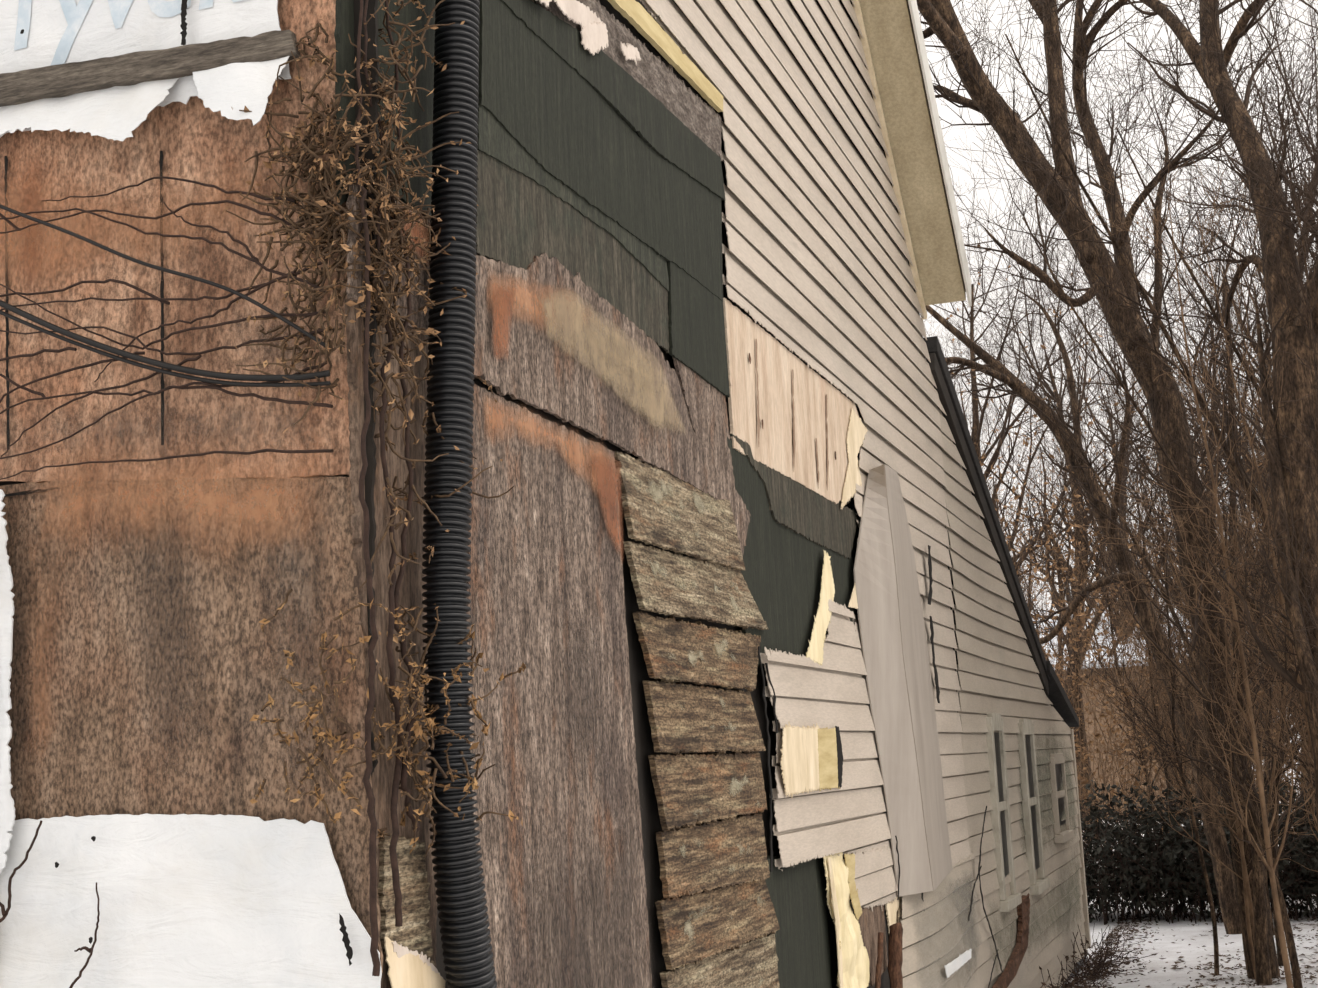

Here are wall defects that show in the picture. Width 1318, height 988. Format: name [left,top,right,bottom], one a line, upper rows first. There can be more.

peeling [539,0,641,65]
peeling [723,298,868,510]
peeling [779,721,843,798]